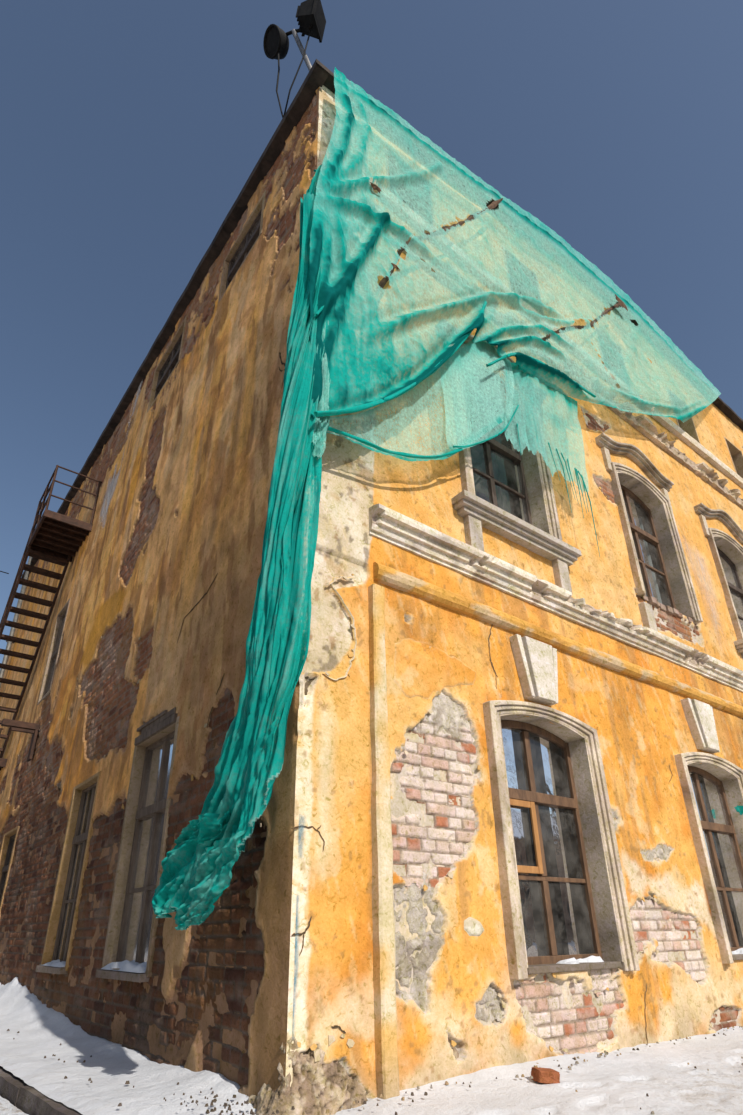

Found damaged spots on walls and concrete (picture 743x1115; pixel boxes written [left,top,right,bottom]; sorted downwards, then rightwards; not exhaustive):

flaking render [263,95,318,260]
flaking render [65,208,248,585]
flaking render [71,607,154,762]
crack [177,573,218,643]
flaking render [304,574,357,707]
flaking render [635,593,700,642]
flaking render [0,683,368,1115]
flaking render [390,692,481,1012]
peeling [641,845,672,861]
flaking render [630,894,706,983]
flaking render [475,968,624,1054]